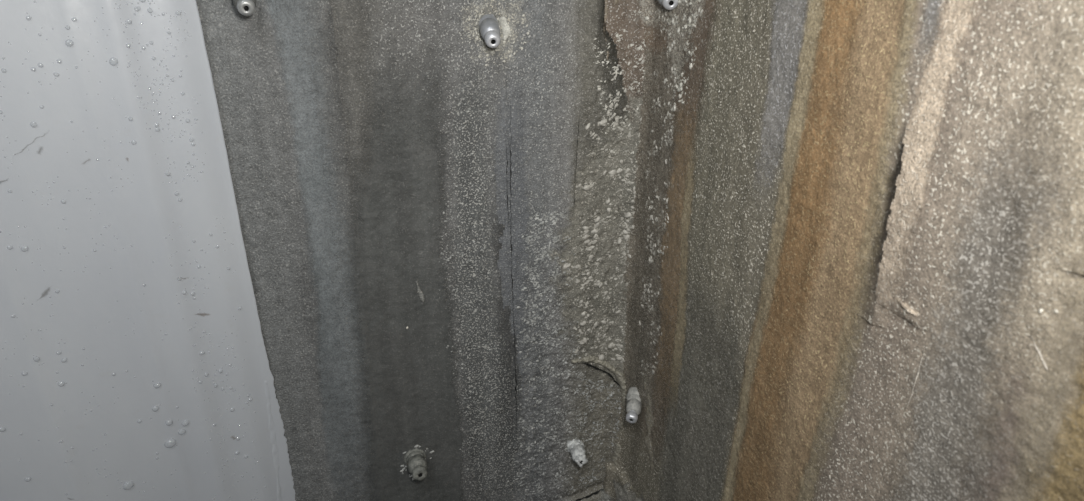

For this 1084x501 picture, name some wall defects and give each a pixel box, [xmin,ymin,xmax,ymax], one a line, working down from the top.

water stain [270,0,704,501]
crack [576,489,604,501]
corrosion [722,0,916,501]